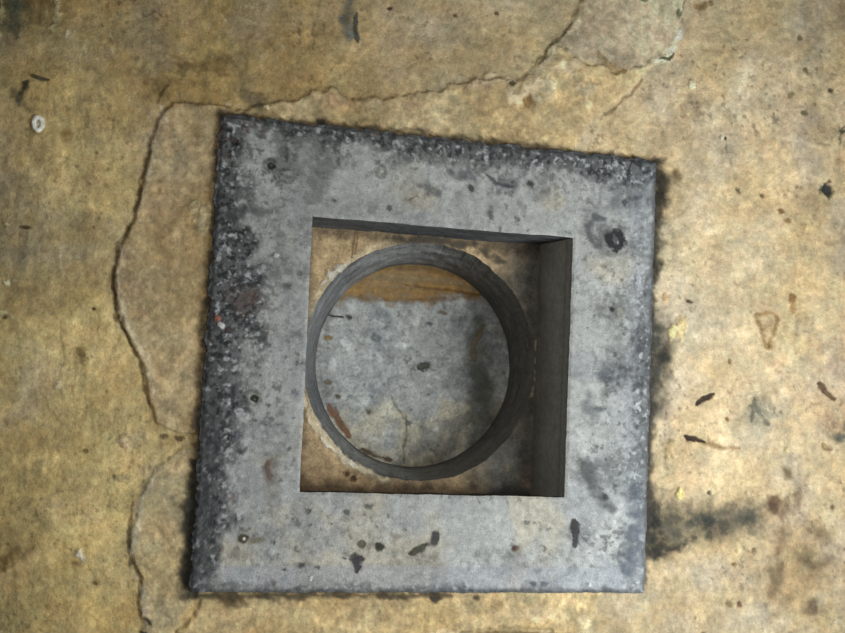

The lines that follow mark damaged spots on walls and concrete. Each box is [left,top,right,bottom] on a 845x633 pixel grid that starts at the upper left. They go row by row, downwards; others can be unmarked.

crack [539,0,583,64]
crack [606,80,643,116]
crack [351,232,359,258]
crack [111,151,151,406]
rust [341,265,481,302]
rust [327,404,351,438]
leakage [646,398,686,560]
crack [127,502,142,617]